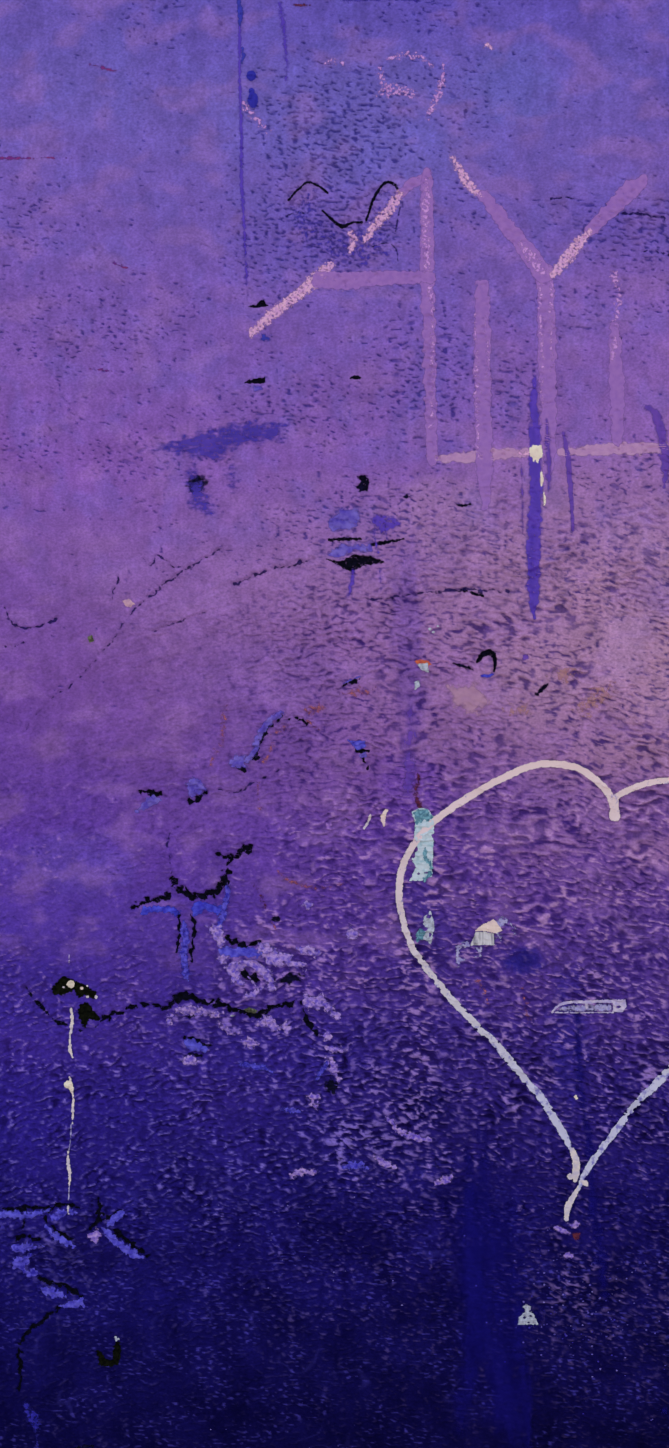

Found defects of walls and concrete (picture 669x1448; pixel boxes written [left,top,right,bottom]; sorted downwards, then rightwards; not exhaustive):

crack [26,833,318,1036]